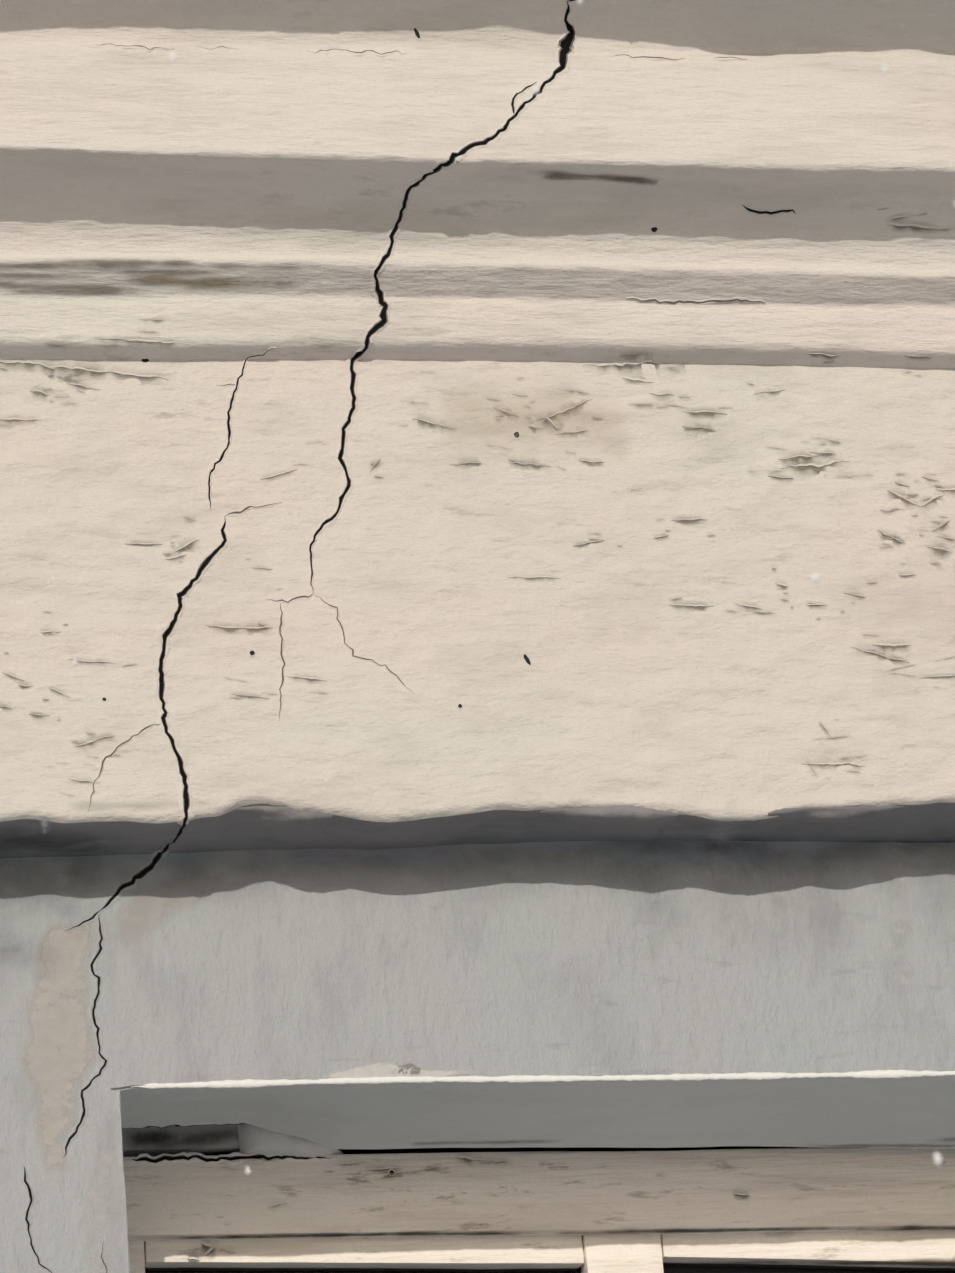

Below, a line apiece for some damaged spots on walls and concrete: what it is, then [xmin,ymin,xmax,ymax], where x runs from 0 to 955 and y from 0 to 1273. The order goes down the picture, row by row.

crack [85,43,238,52]
crack [607,54,747,62]
crack [626,296,765,305]
crack [266,0,577,720]
peeling [767,452,850,479]
peeling [887,476,955,507]
peeling [925,520,955,565]
peeling [851,642,911,663]
crack [63,347,282,1158]
crack [131,1121,334,1166]
crack [22,1166,53,1273]